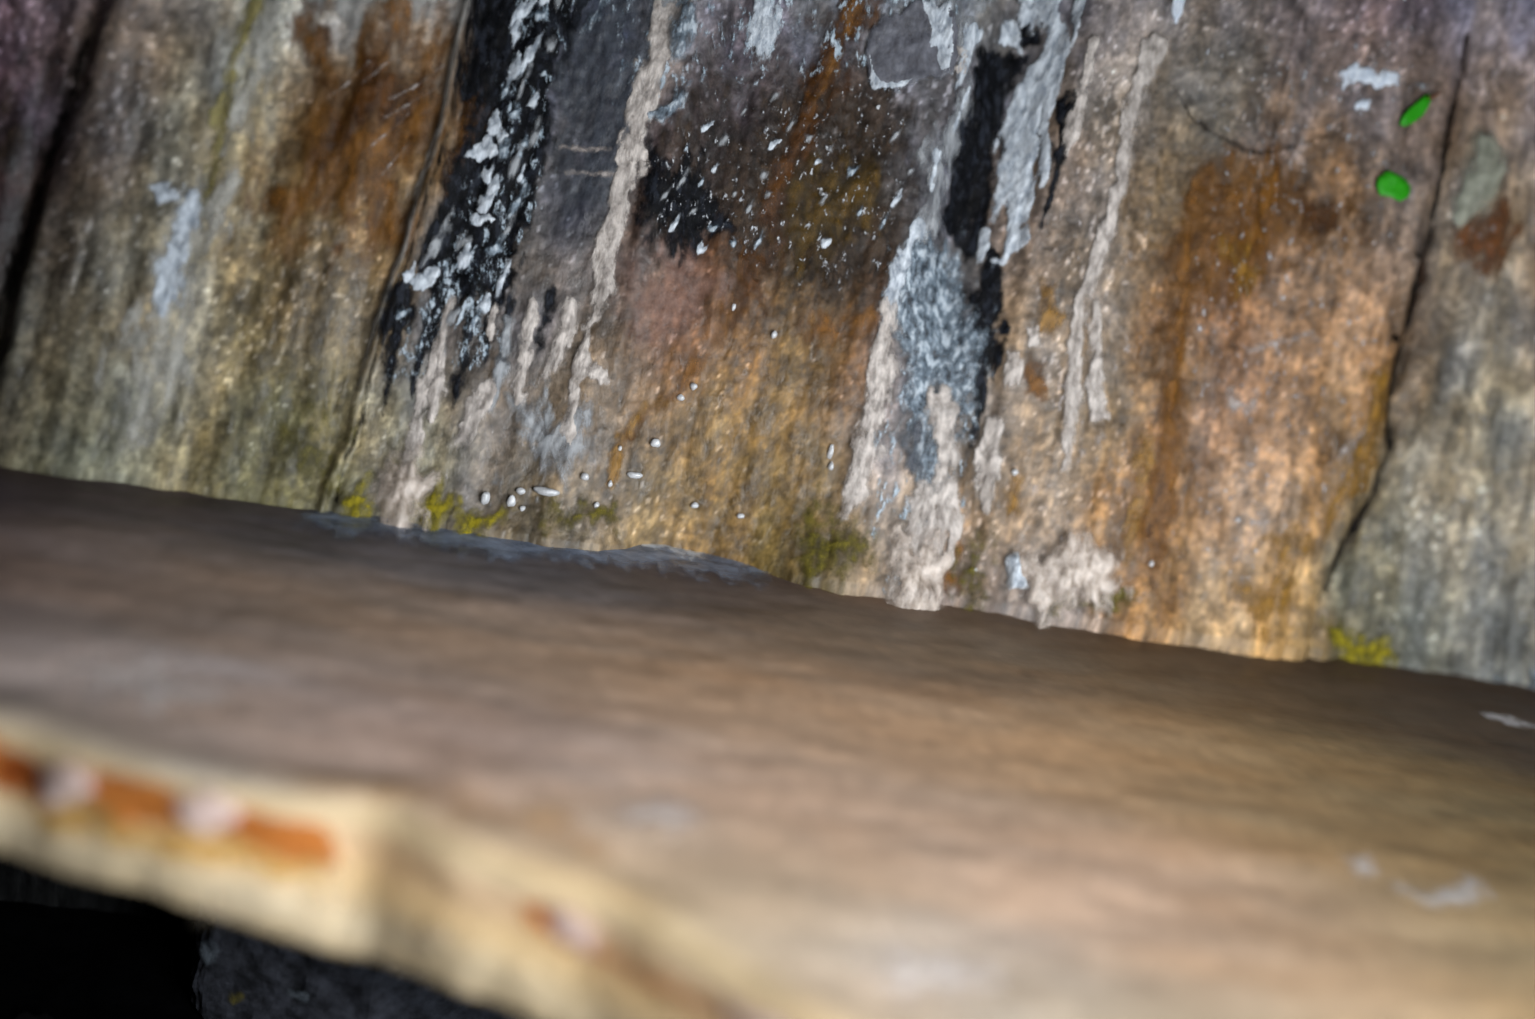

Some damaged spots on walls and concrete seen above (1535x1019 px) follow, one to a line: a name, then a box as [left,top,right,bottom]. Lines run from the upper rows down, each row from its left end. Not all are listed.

corrosion [245,0,453,261]
leakage [381,259,472,470]
leakage [454,0,734,511]
leakage [747,0,783,59]
leakage [810,0,1100,565]
leakage [1061,33,1168,472]
corrosion [1124,144,1369,588]
corrosion [1235,369,1389,639]
crack [1325,35,1469,592]
corrosion [0,742,338,877]